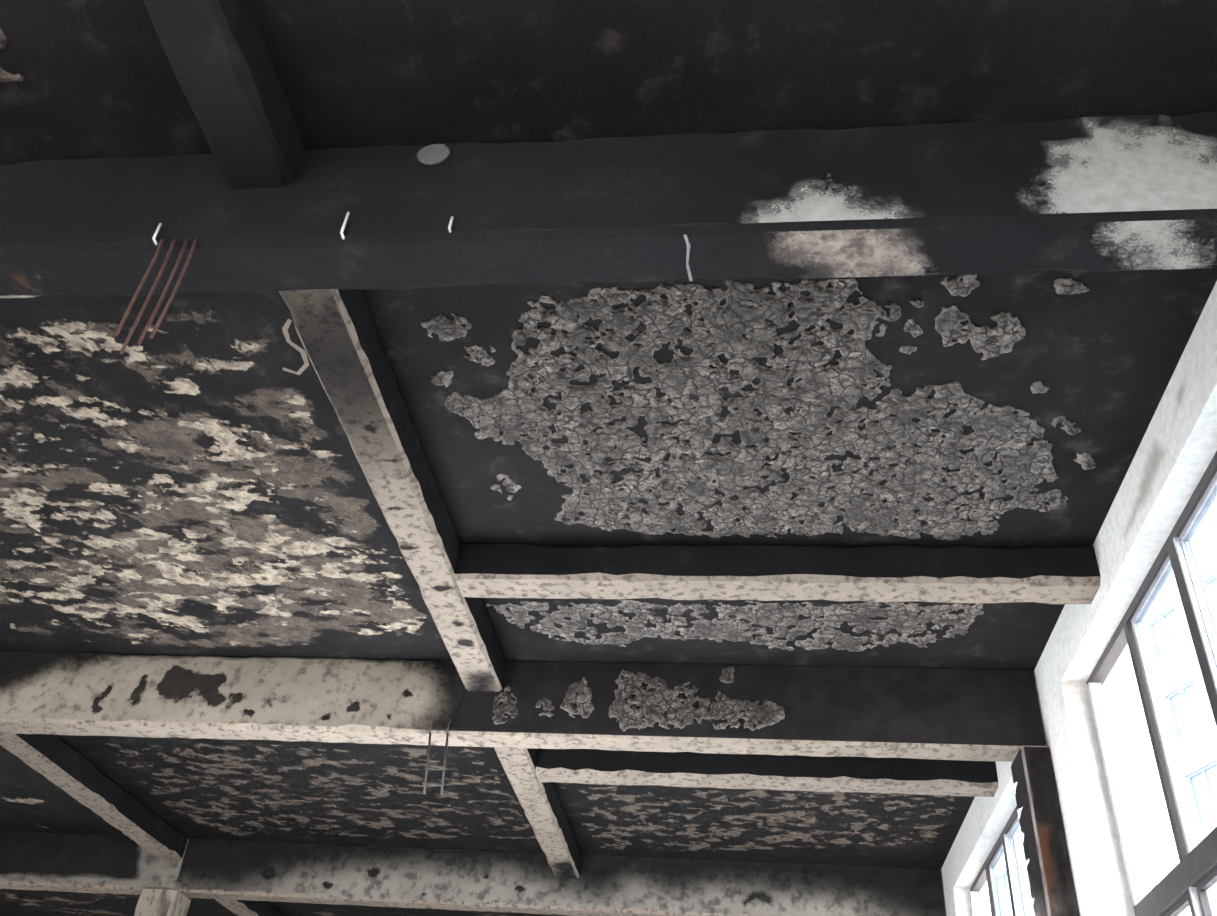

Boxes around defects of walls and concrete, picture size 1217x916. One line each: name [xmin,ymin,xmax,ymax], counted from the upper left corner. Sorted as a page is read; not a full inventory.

flaking render [0,28,24,83]
flaking render [1054,278,1089,294]
flaking render [148,311,222,333]
flaking render [421,184,1081,541]
flaking render [0,319,428,648]
flaking render [1073,453,1096,470]
flaking render [485,599,984,652]
flaking render [492,686,518,725]
flaking render [536,666,785,732]
flaking render [105,743,537,839]
flaking render [560,786,960,851]